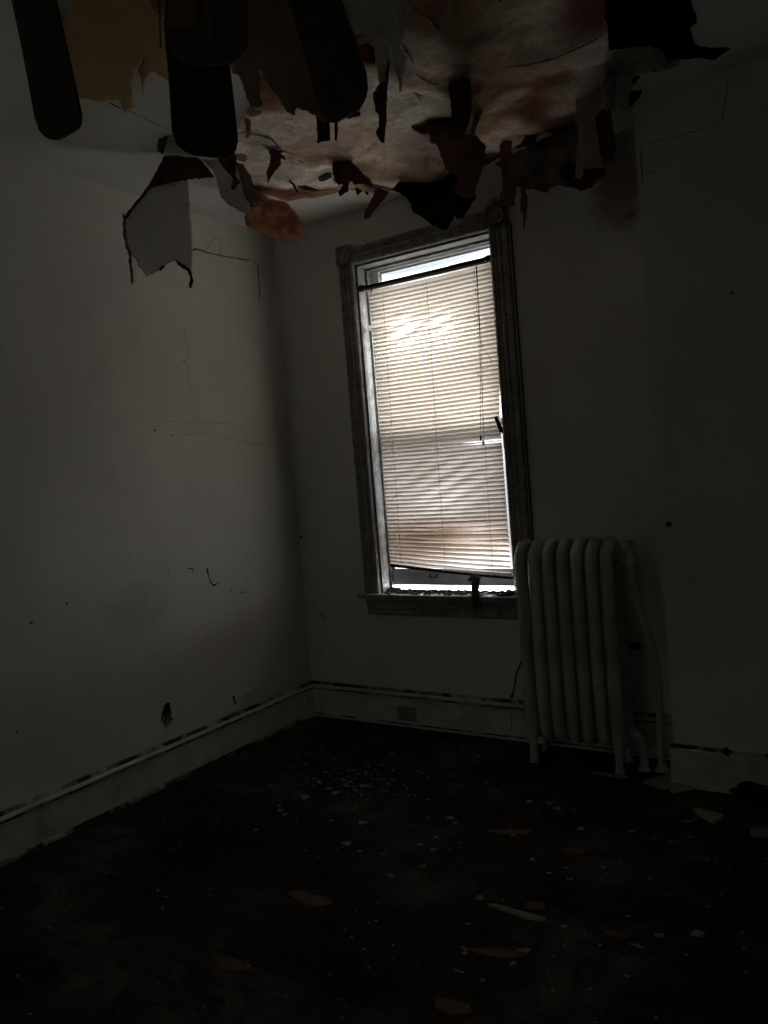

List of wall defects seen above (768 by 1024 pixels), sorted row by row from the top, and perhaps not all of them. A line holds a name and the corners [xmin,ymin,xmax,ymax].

flaking render [495,46,680,229]
crack [192,237,260,298]
spalling [161,702,173,735]